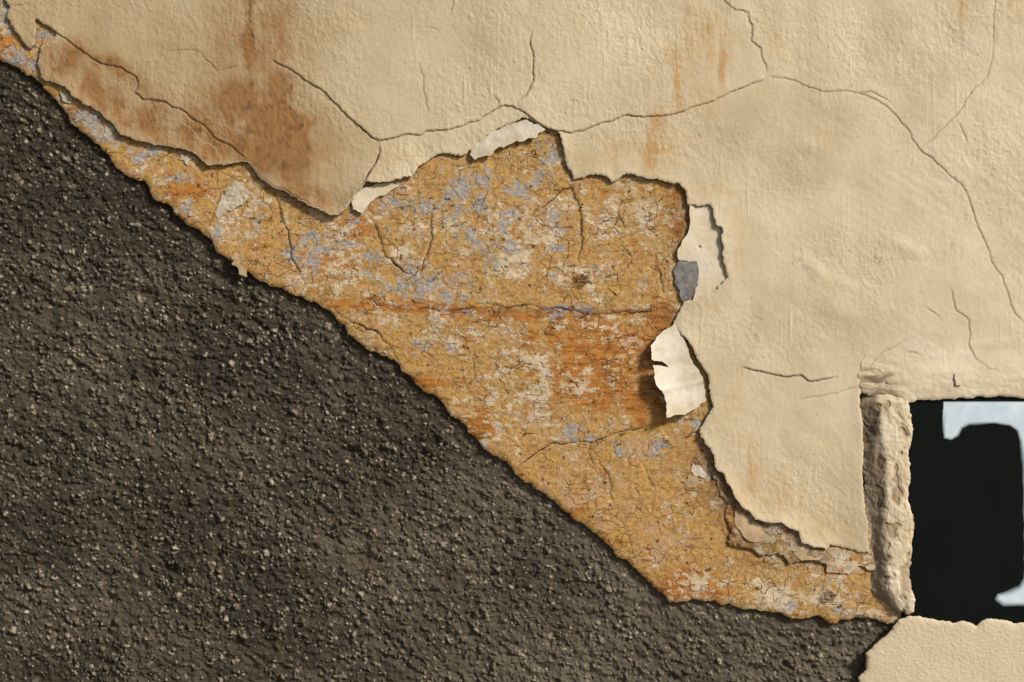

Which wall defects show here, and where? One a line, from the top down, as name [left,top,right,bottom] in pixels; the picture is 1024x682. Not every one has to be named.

peeling [0,0,115,146]
crack [42,25,248,161]
crack [272,1,1022,320]
crack [335,311,395,356]
peeling [100,120,902,624]
crack [930,289,1001,372]